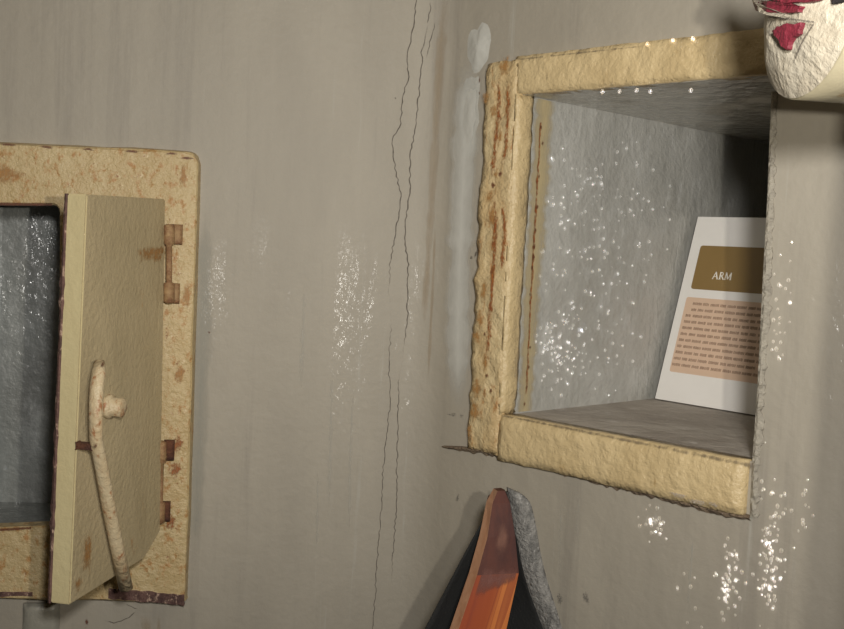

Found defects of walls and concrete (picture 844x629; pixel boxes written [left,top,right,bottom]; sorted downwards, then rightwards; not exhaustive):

crack [372,0,435,628]
corrosion [473,85,510,393]
corrosion [526,122,544,392]